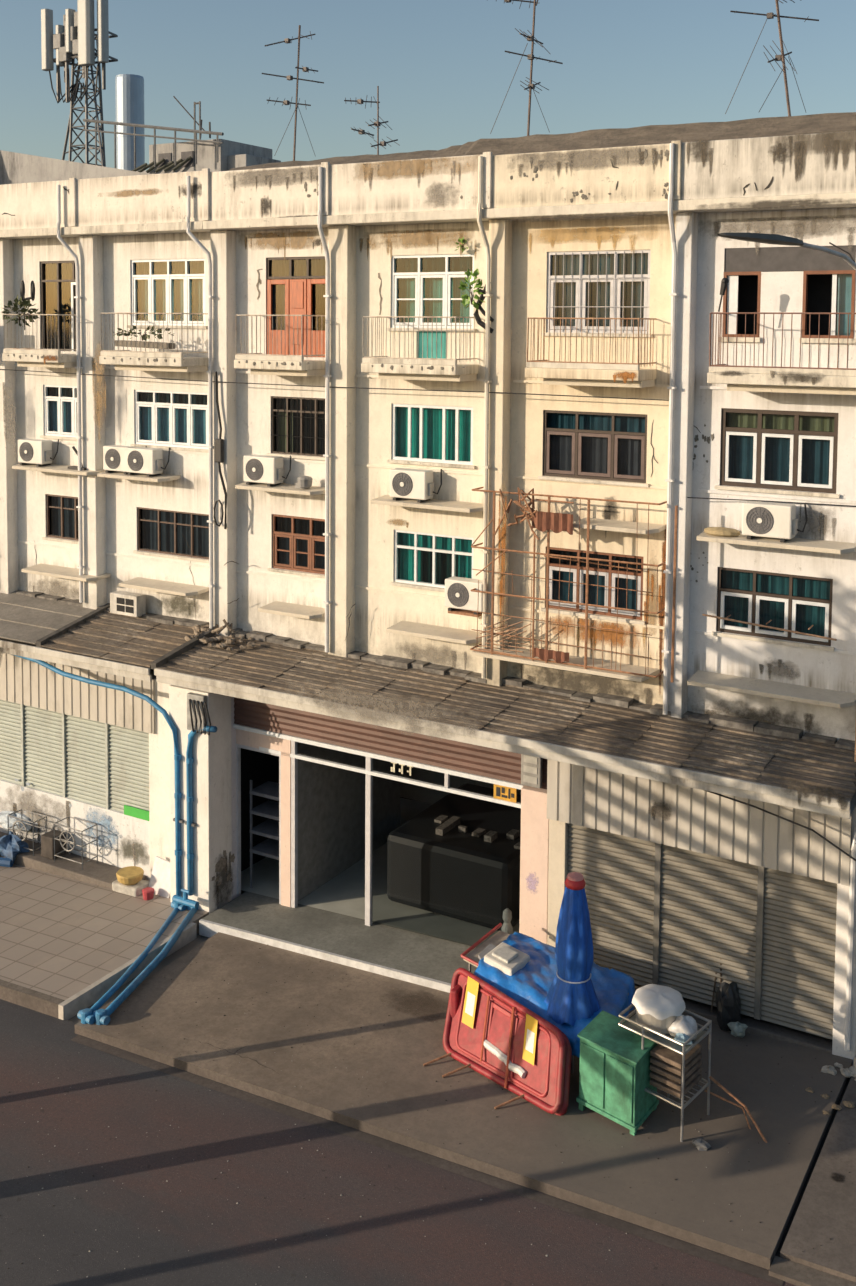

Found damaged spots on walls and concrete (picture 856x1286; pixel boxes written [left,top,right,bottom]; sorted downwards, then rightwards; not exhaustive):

water stain [518,148,663,176]
water stain [687,140,713,173]
water stain [772,130,856,178]
water stain [234,168,322,260]
corrosion [613,372,636,383]
water stain [603,499,617,532]
water stain [800,507,836,536]
corrosion [533,525,667,685]
water stain [759,660,797,678]
water stain [649,803,671,820]
water stain [215,853,232,905]